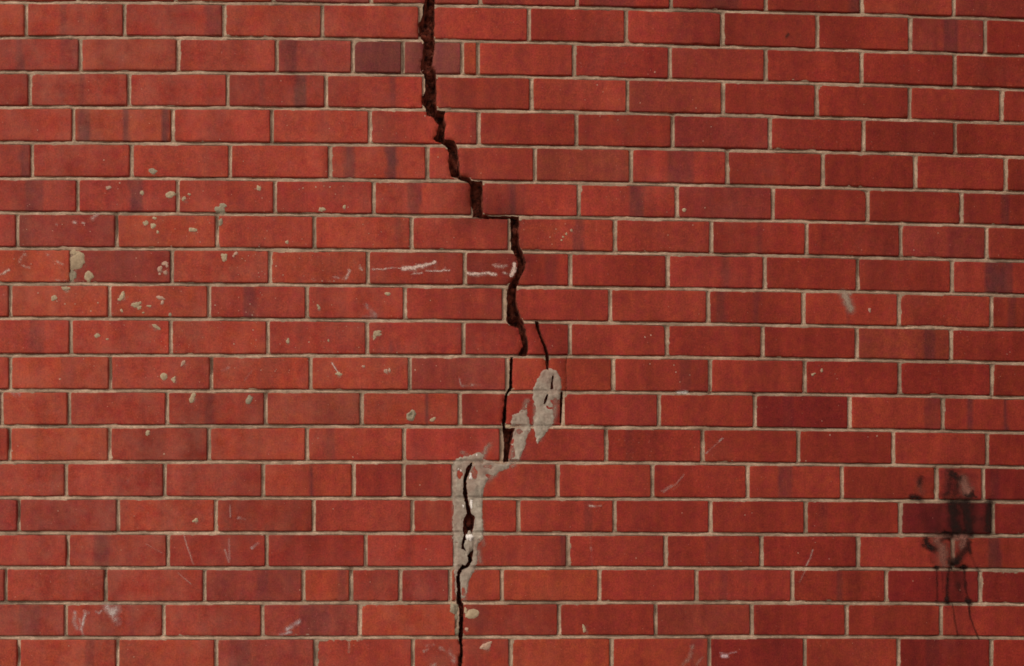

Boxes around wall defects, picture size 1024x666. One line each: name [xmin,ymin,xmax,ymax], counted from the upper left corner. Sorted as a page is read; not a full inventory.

crack [418,0,567,463]
crack [456,463,475,666]
leakage [936,568,979,639]
leakage [948,498,993,537]